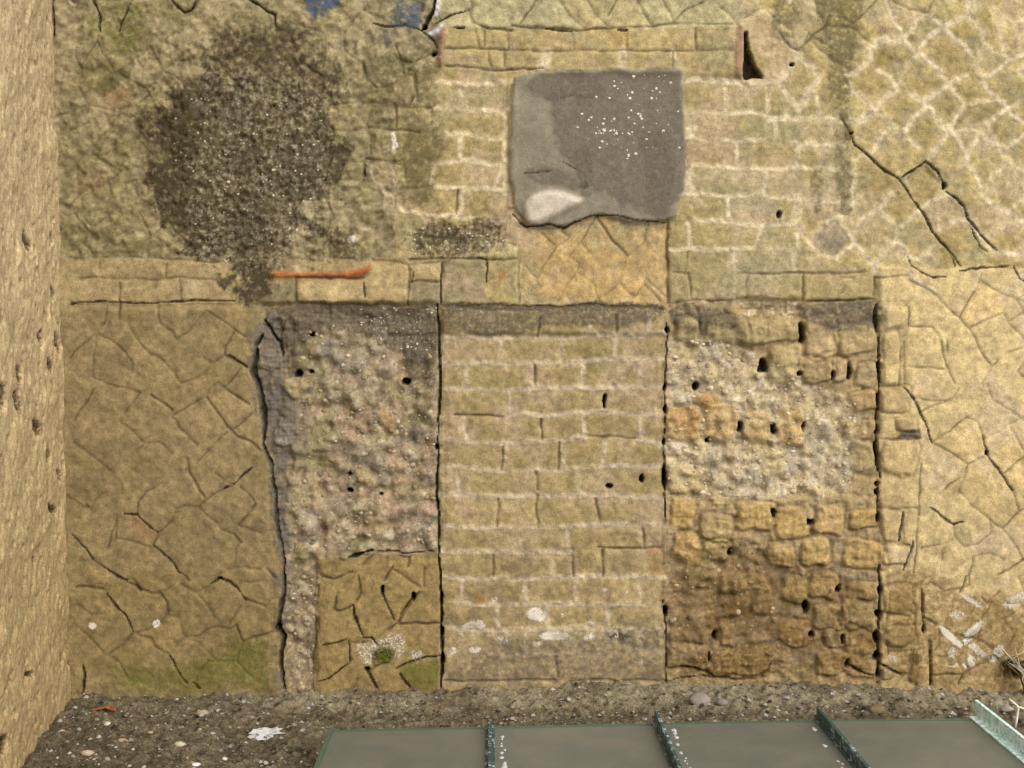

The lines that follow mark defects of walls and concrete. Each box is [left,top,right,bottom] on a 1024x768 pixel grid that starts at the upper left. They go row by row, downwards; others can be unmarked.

crack [842,122,1024,281]
leakage [132,0,738,639]
crack [224,320,287,688]
crack [319,605,378,688]
spalling [281,324,439,692]
crack [349,263,445,688]
leakage [526,607,641,679]
crack [660,322,668,517]
spalling [667,545,800,655]
spalling [666,337,866,505]
crack [845,307,932,685]
crack [982,435,1013,491]